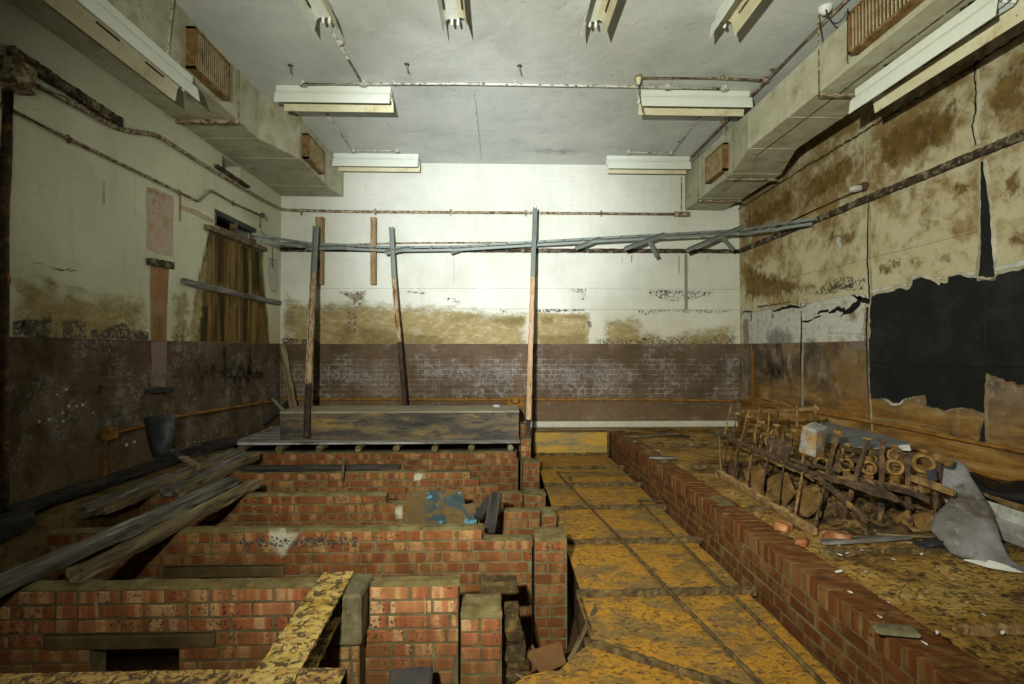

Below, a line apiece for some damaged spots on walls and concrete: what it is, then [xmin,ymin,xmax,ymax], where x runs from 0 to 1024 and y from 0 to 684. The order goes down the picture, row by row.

corrosion [881,99,957,168]
corrosion [745,190,791,231]
corrosion [804,156,856,206]
corrosion [1006,171,1019,195]
corrosion [830,231,855,250]
water stain [13,279,148,340]
water stain [282,289,736,344]
crack [740,202,873,430]
mould [816,277,865,295]
flaking render [741,260,1024,416]